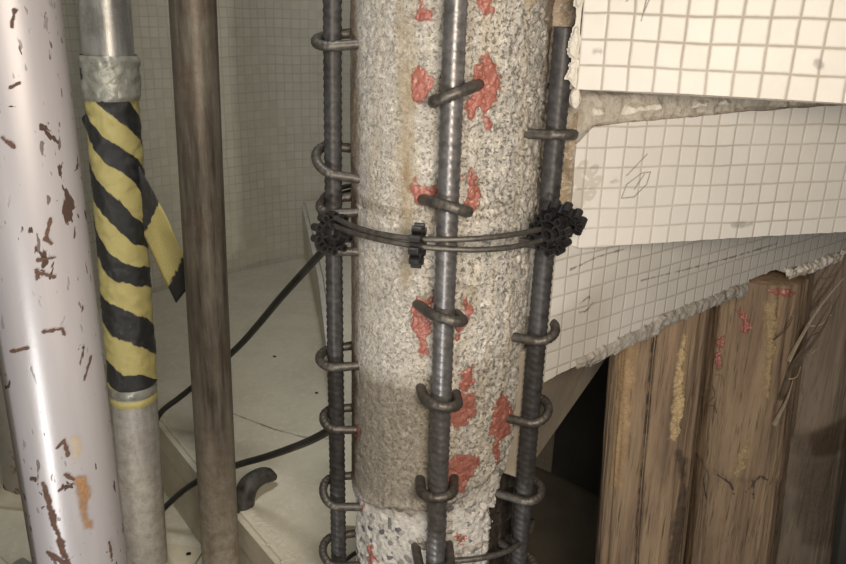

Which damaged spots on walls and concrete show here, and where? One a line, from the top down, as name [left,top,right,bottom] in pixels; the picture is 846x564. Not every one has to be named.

flaking render [564,25,581,84]
flaking render [567,91,839,138]
spalling [784,249,846,279]
spalling [576,282,749,369]
damp [450,364,477,428]
damp [488,391,513,464]
damp [448,454,480,493]